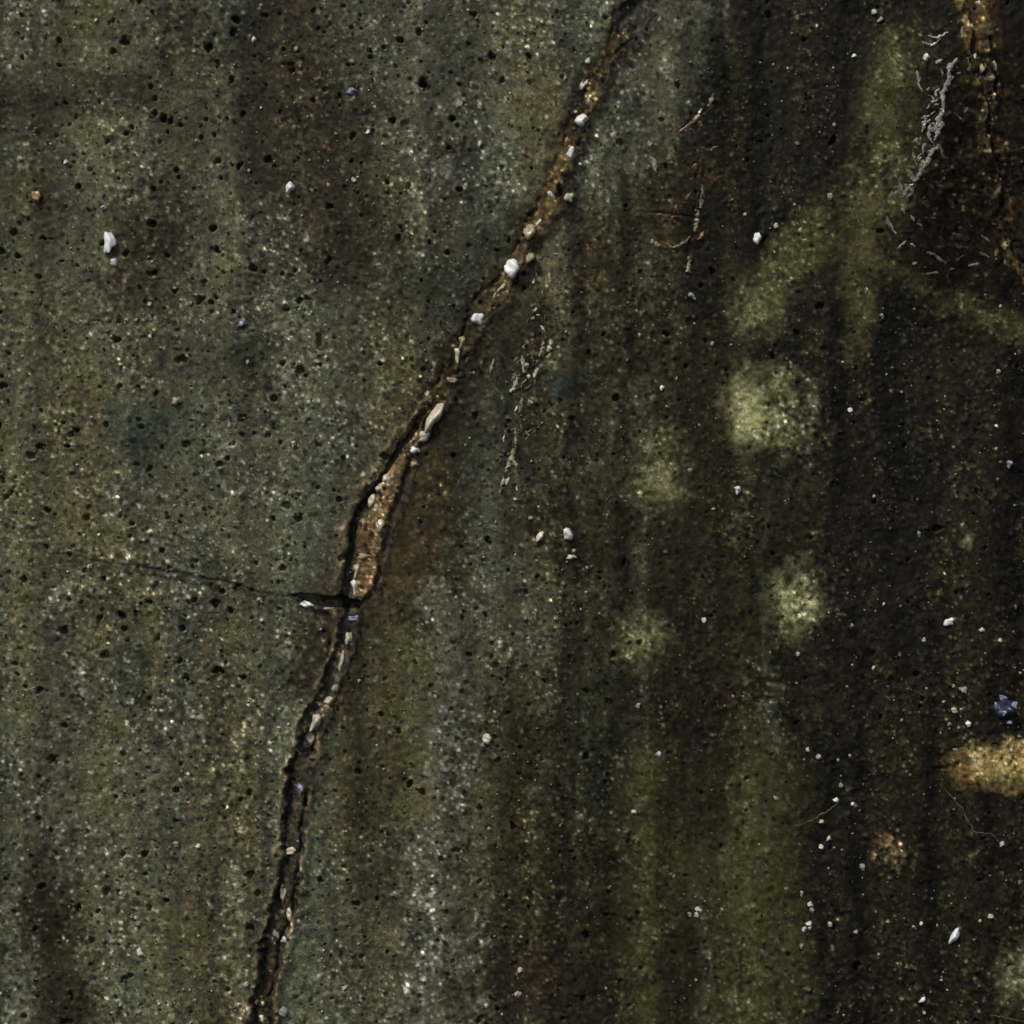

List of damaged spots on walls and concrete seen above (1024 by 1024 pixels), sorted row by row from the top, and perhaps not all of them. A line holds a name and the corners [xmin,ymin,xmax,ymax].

crack [56,0,660,1024]
leakage [339,0,1024,1024]
crack [641,88,723,272]